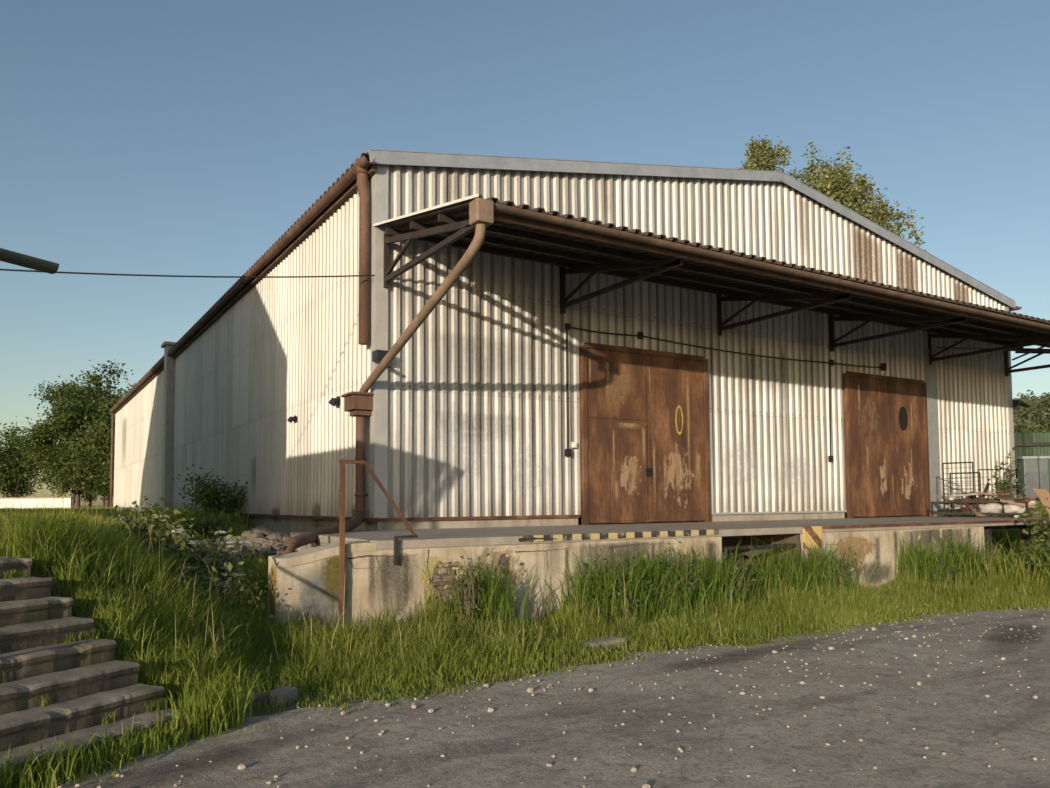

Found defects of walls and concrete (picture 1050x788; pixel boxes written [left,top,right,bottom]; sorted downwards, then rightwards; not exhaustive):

peeling [613,382,700,509]
water stain [302,559,339,621]
water stain [370,557,412,606]